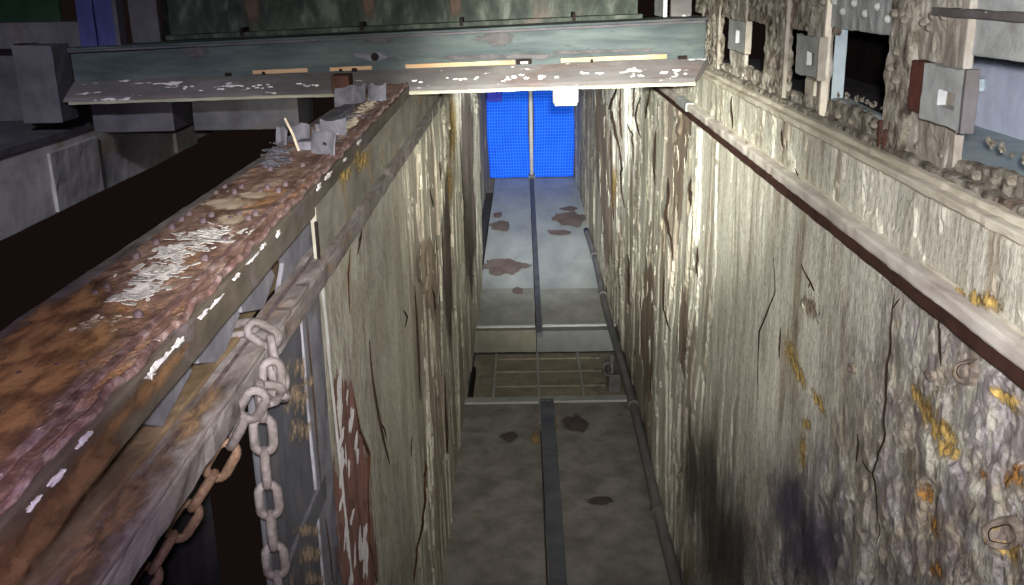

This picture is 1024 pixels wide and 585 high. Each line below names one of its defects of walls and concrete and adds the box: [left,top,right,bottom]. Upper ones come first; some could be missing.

rust [488,212,509,231]
rust [482,258,532,276]
rust [547,206,586,235]
crack [606,88,699,332]
crack [757,258,781,399]
rust [956,288,1002,312]
peeling [321,288,379,585]
crack [353,285,449,583]
crack [856,294,900,544]
rust [910,385,961,460]
leakage [685,433,744,582]
leakage [776,482,841,577]